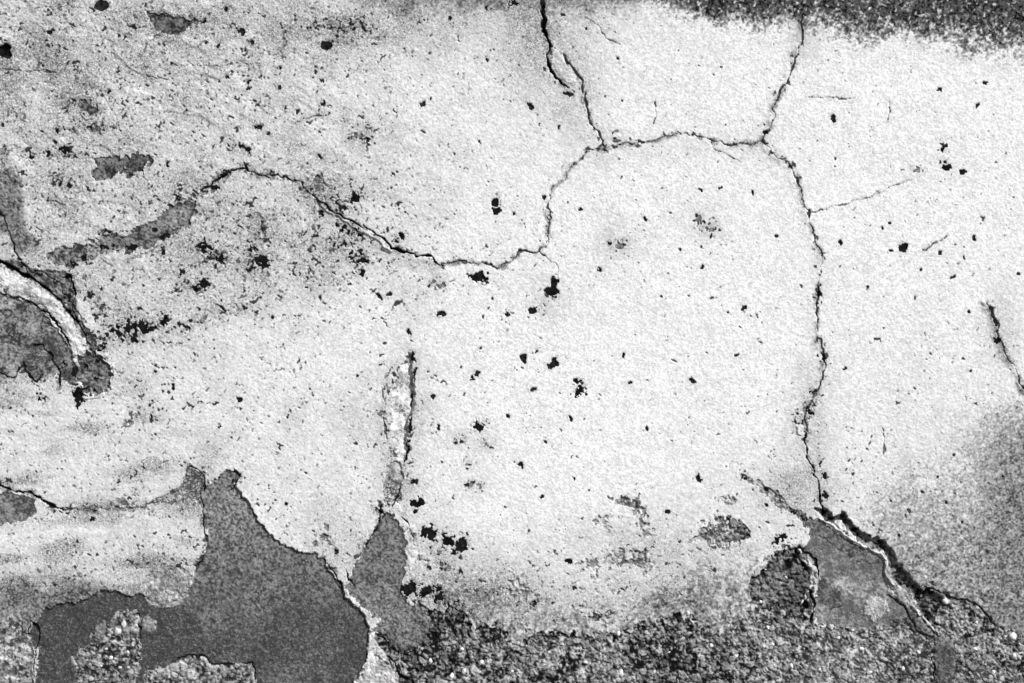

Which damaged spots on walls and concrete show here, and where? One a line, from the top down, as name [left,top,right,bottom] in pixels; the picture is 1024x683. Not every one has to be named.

crack [540,0,659,168]
water stain [388,0,1024,58]
peeling [0,172,232,400]
crack [200,166,552,270]
hole [377,352,428,463]
crack [687,15,997,638]
crack [989,307,1024,389]
spalling [0,469,1024,683]